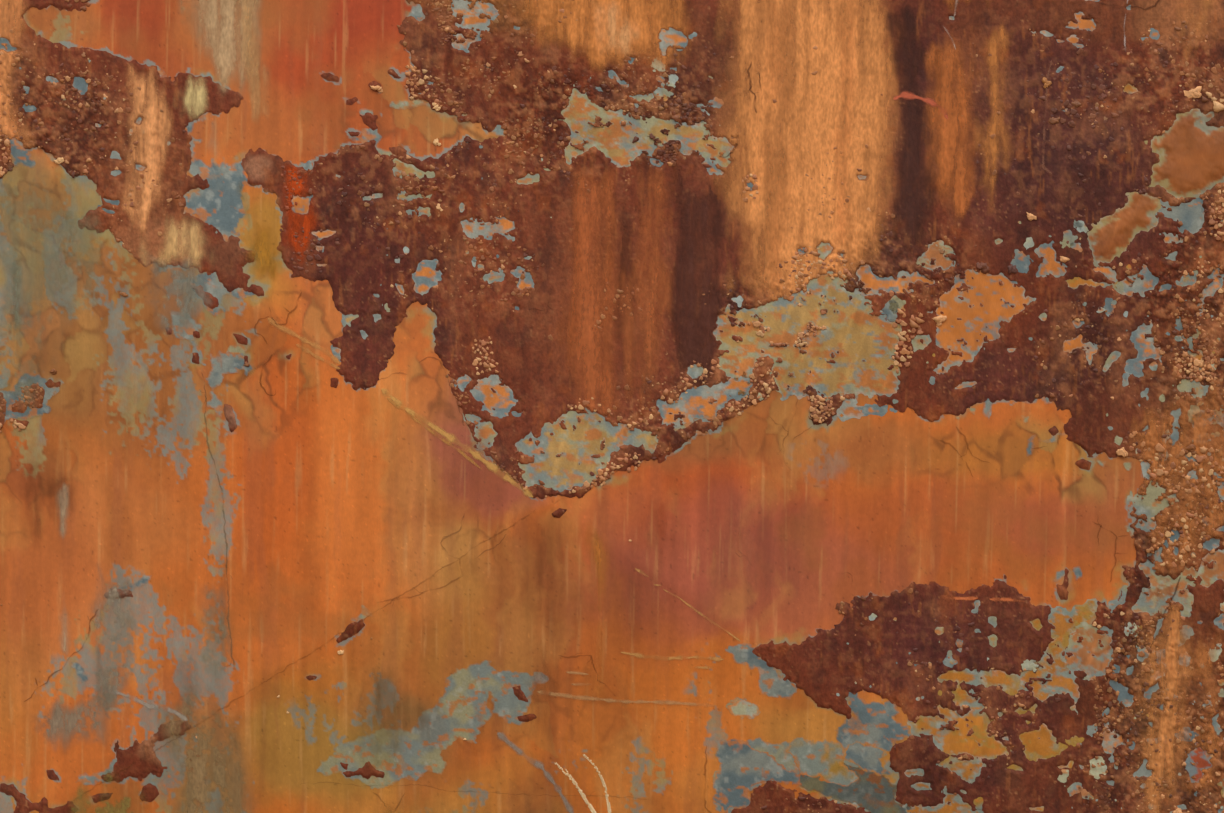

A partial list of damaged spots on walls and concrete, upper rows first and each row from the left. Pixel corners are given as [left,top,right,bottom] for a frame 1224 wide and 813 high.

rust [0,0,264,309]
peeling [169,272,256,418]
peeling [454,374,521,451]
peeling [515,108,1224,492]
peeling [1123,316,1224,536]
peeling [316,660,549,789]
rust [752,575,1031,737]
rust [889,745,987,811]
peeling [712,517,1224,813]
rust [982,785,1064,813]
rust [993,605,1059,676]
rust [1155,579,1224,813]